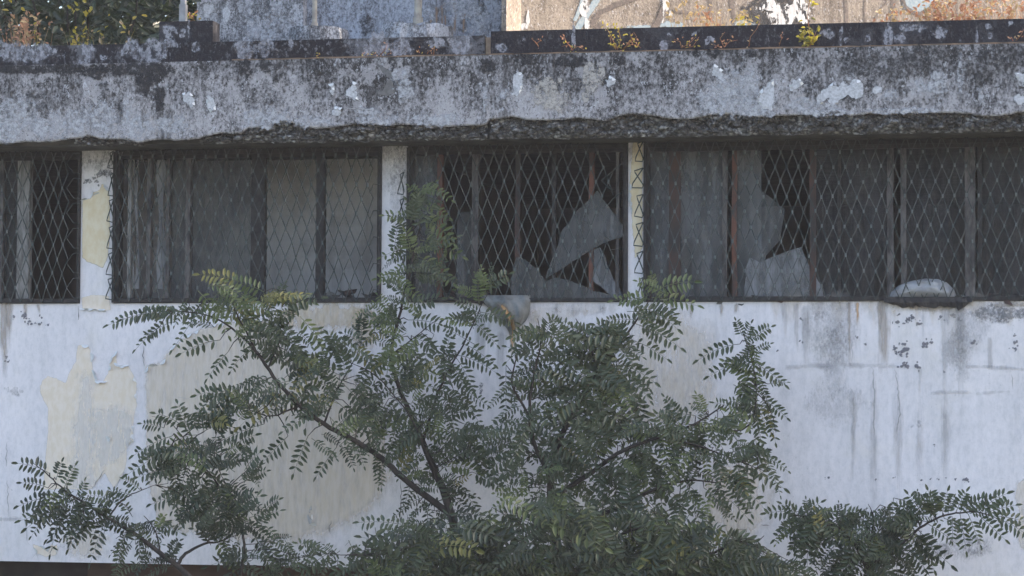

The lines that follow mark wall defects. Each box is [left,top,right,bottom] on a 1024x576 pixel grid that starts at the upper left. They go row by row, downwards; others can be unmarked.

mould [27,91,49,119]
mould [0,62,180,111]
mould [235,57,284,83]
spalling [200,58,1024,257]
peeling [81,183,111,267]
peeling [80,295,110,312]
water stain [878,301,933,372]
mould [973,304,1024,351]
peeling [40,320,384,541]